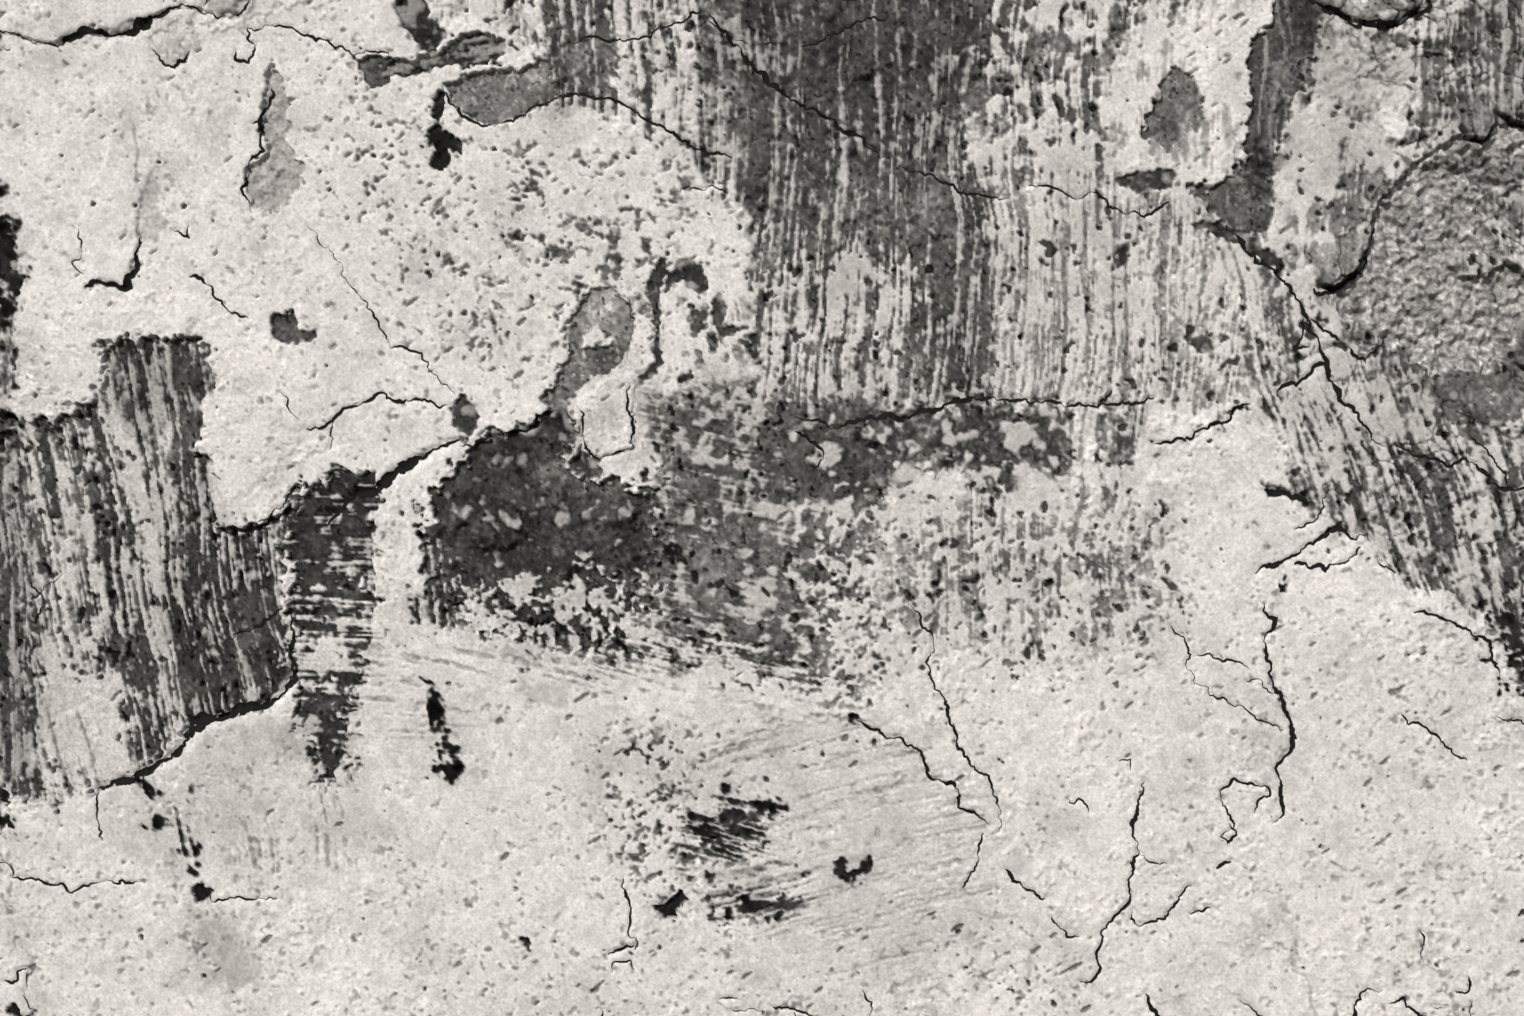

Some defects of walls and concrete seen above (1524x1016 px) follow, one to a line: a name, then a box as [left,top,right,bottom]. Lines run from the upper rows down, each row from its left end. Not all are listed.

crack [0,0,389,207]
peeling [0,335,390,816]
peeling [271,309,317,346]
peeling [407,287,674,663]
crack [795,389,1154,473]
crack [855,485,1396,983]
peeling [1117,0,1324,240]
crack [1154,225,1524,491]
spalling [1314,87,1524,377]
crack [1402,715,1467,760]
crack [1413,610,1503,681]
crack [1352,976,1472,1016]